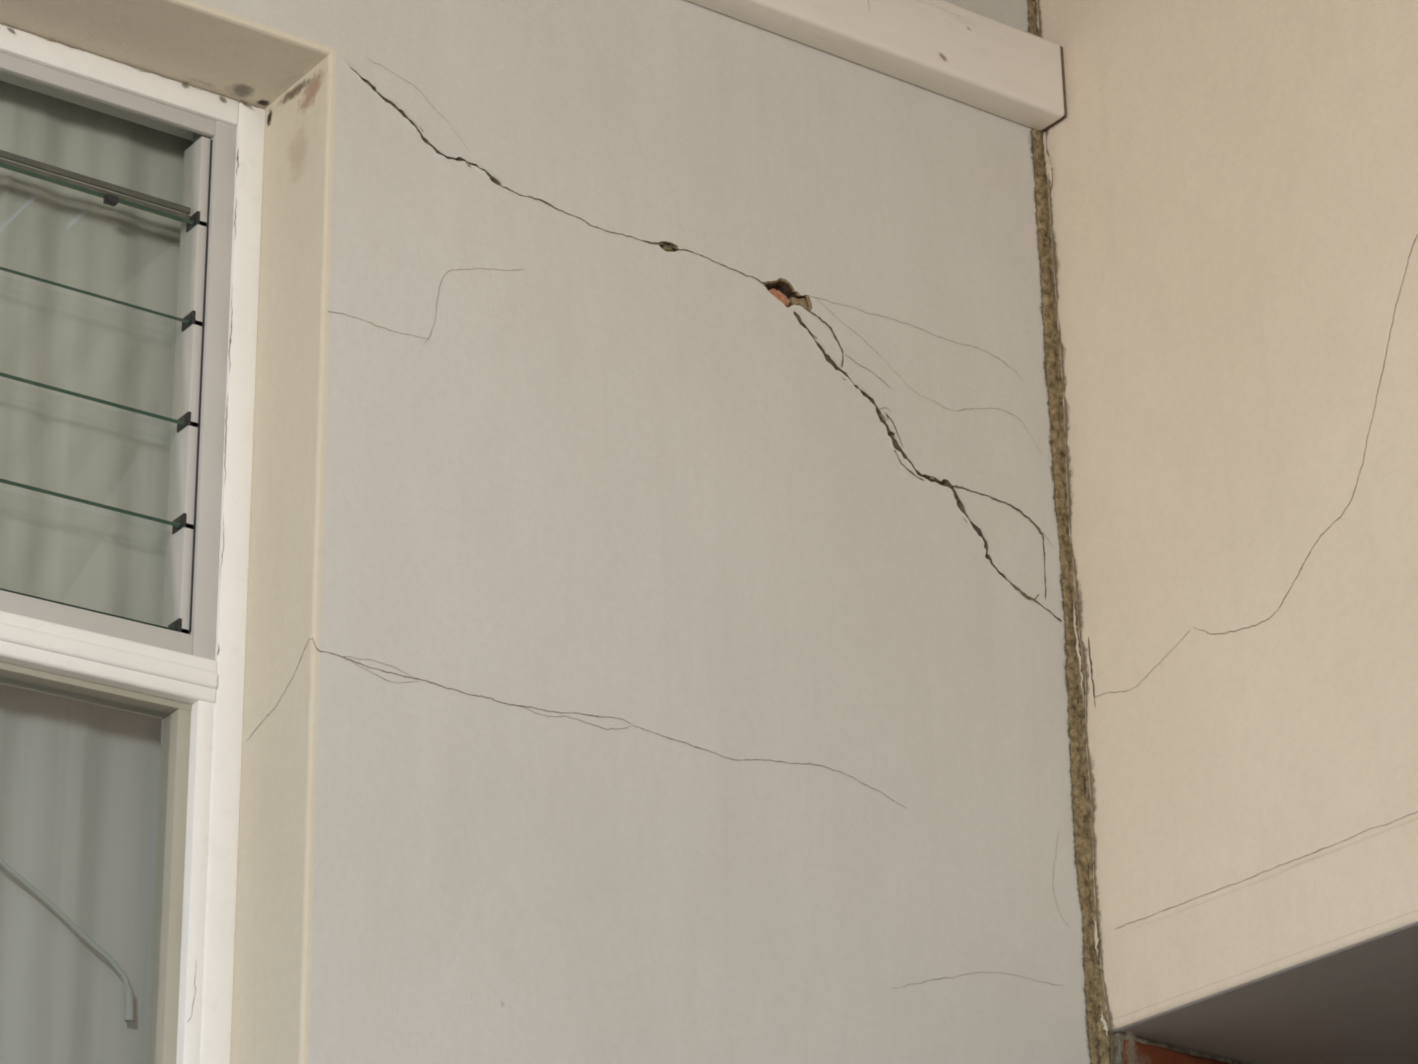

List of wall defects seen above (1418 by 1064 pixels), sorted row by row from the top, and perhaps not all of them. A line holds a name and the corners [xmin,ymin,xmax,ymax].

crack [340,57,765,285]
crack [327,268,521,339]
spalling [763,278,812,312]
crack [791,296,1062,622]
crack [1095,234,1418,697]
crack [246,638,906,808]